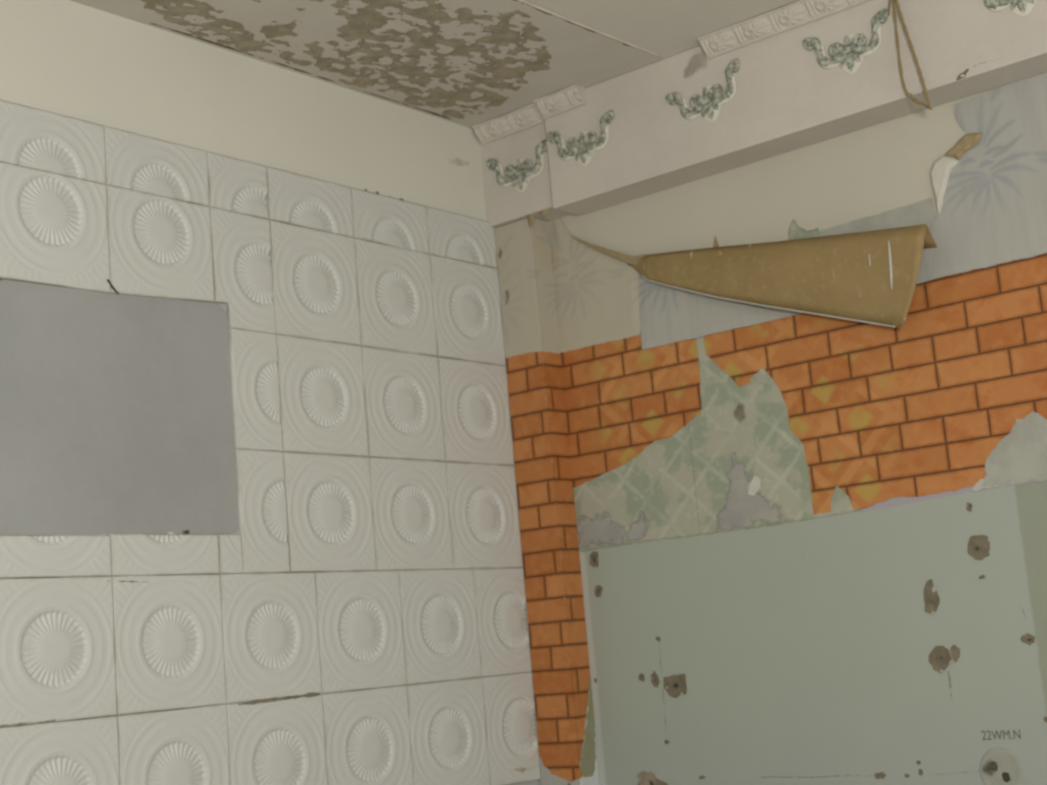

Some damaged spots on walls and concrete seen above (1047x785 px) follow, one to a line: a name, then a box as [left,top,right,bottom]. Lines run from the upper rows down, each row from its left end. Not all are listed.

peeling [141,0,551,119]
flaking render [819,198,936,236]
flaking render [967,535,990,560]
flaking render [924,579,940,616]
flaking render [929,645,960,674]
flaking render [638,671,687,698]
flaking render [637,771,668,785]